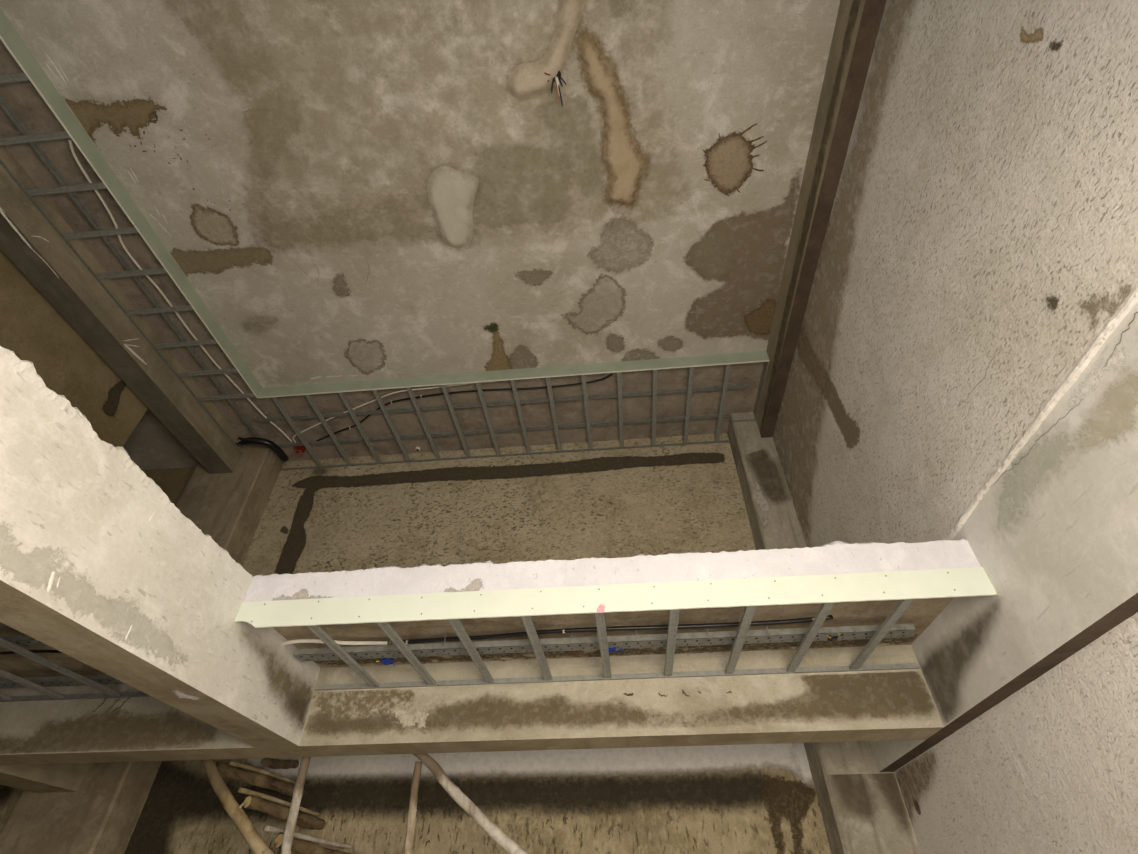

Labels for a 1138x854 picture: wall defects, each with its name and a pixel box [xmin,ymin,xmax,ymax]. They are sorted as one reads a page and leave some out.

damp [562,0,912,538]
spalling [0,346,607,579]
peeling [272,589,332,601]
peeling [443,579,483,592]
spalling [634,541,916,560]
damp [0,710,215,753]
damp [256,646,674,734]
damp [693,613,991,726]
damp [0,786,13,804]
damp [124,761,816,854]